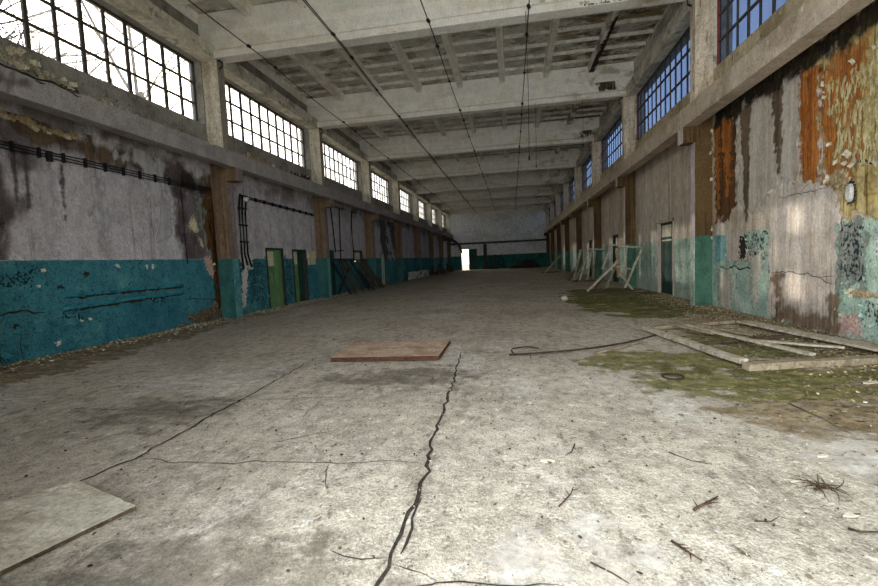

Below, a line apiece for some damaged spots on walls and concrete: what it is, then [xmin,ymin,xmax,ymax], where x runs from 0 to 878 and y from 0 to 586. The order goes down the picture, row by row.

peeling [0,44,79,93]
peeling [0,109,85,140]
damp [0,112,212,260]
flaking render [738,41,878,339]
crack [223,397,418,486]
crack [330,550,562,586]